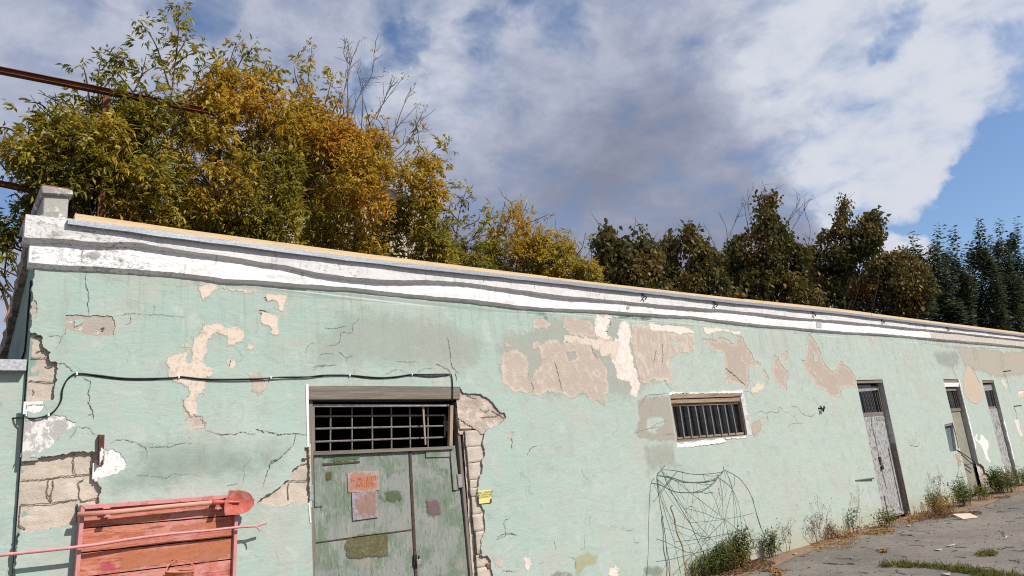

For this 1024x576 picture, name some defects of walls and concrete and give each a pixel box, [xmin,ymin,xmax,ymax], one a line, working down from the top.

peeling [259,293,287,335]
peeling [166,323,257,438]
peeling [500,306,789,440]
peeling [801,335,857,398]
peeling [930,331,1024,404]
flaking render [16,300,126,535]
crack [207,429,306,486]
flaking render [257,444,312,507]
flaking render [443,390,505,576]